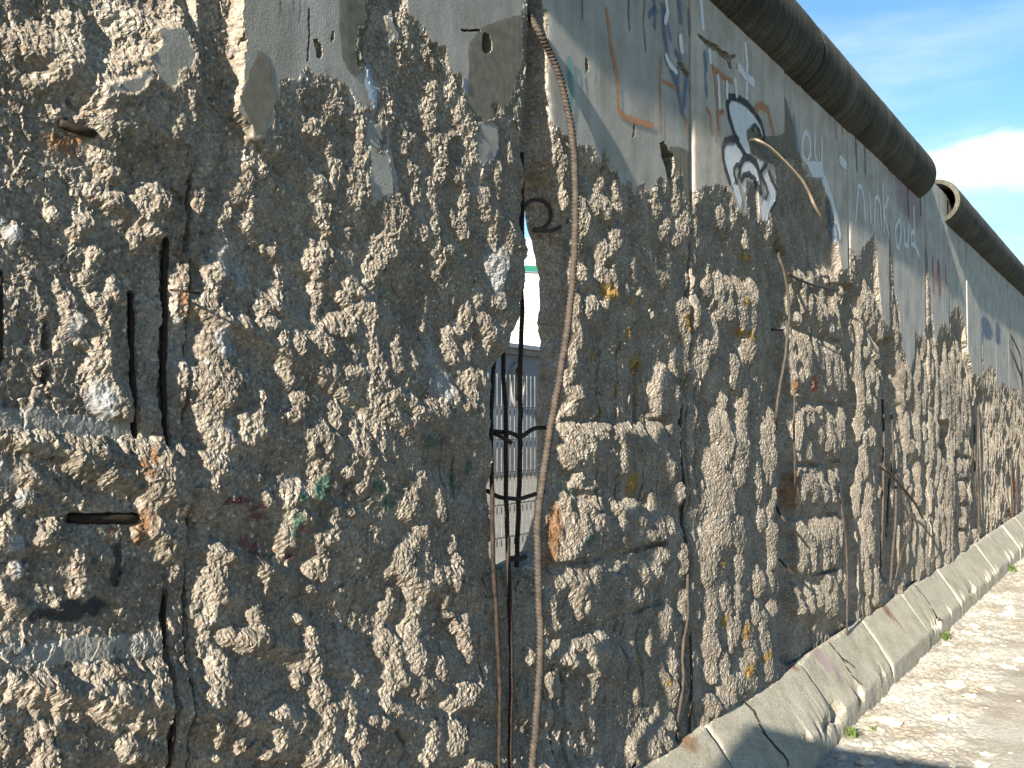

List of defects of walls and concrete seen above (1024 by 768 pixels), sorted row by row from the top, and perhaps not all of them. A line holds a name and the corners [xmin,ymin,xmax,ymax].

spalling [0,0,528,768]
spalling [508,0,1024,768]
rust [544,508,561,573]
crack [179,557,187,641]
crack [743,701,789,766]